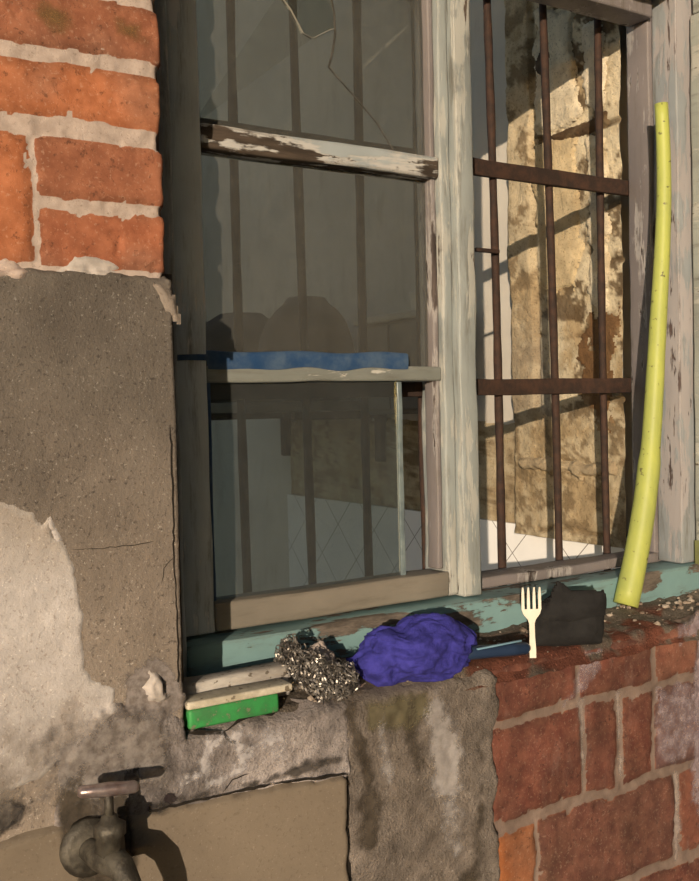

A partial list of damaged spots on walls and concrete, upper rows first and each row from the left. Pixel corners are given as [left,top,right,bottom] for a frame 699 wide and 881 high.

rust [576,306,621,378]
rust [578,393,615,434]
peeling [0,502,184,793]
damp [660,613,699,801]
damp [0,793,32,834]
damp [58,768,136,865]
spalling [149,793,177,810]
damp [180,725,283,789]
damp [345,703,381,850]
damp [426,698,463,828]